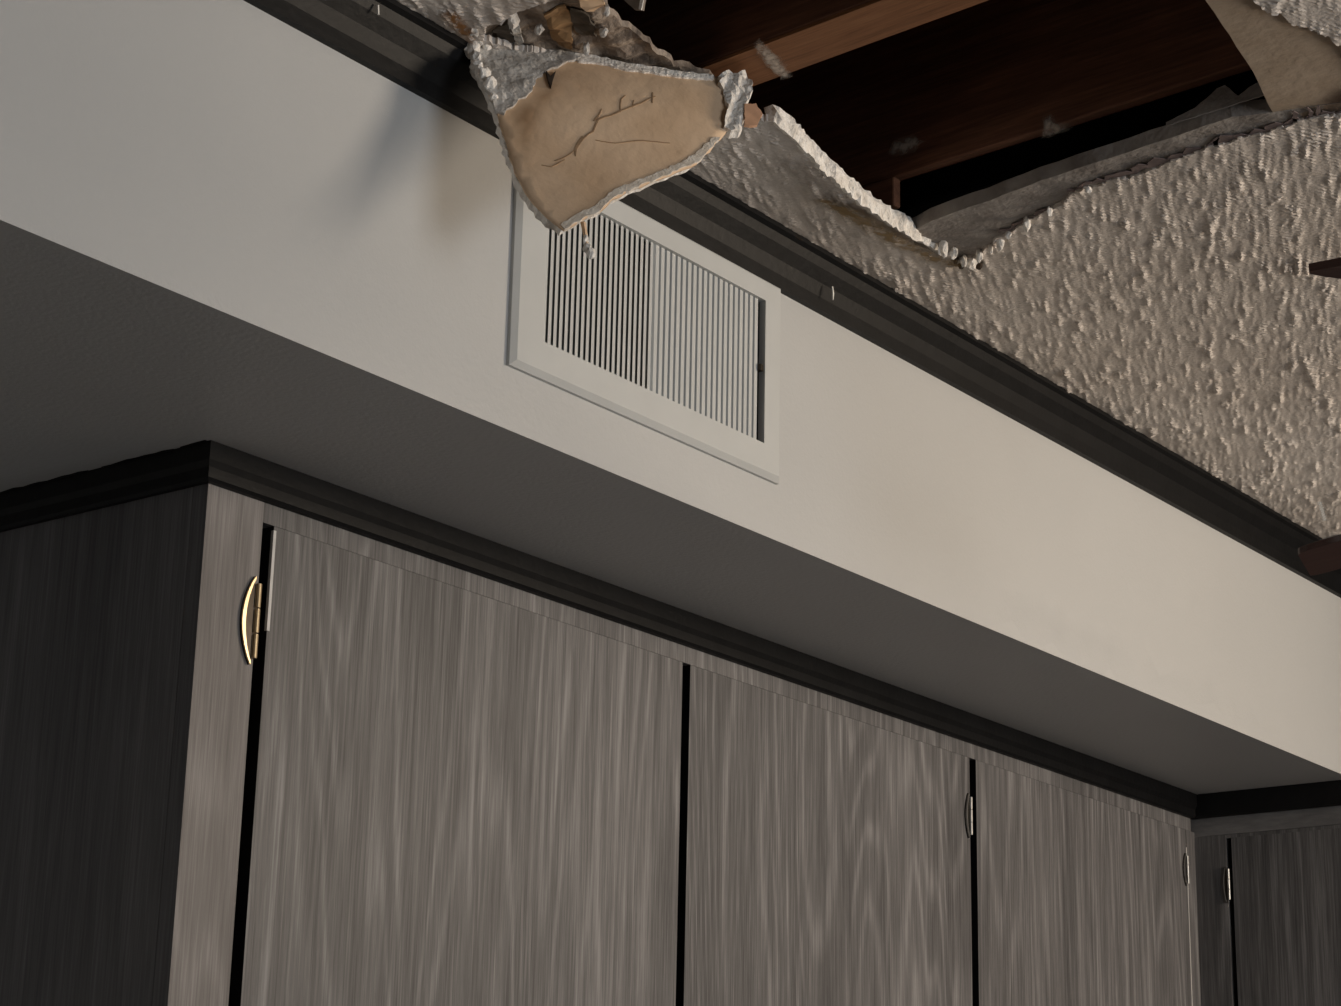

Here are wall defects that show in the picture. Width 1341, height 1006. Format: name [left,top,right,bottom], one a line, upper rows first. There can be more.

crack [542,92,669,167]
spalling [911,0,1341,270]